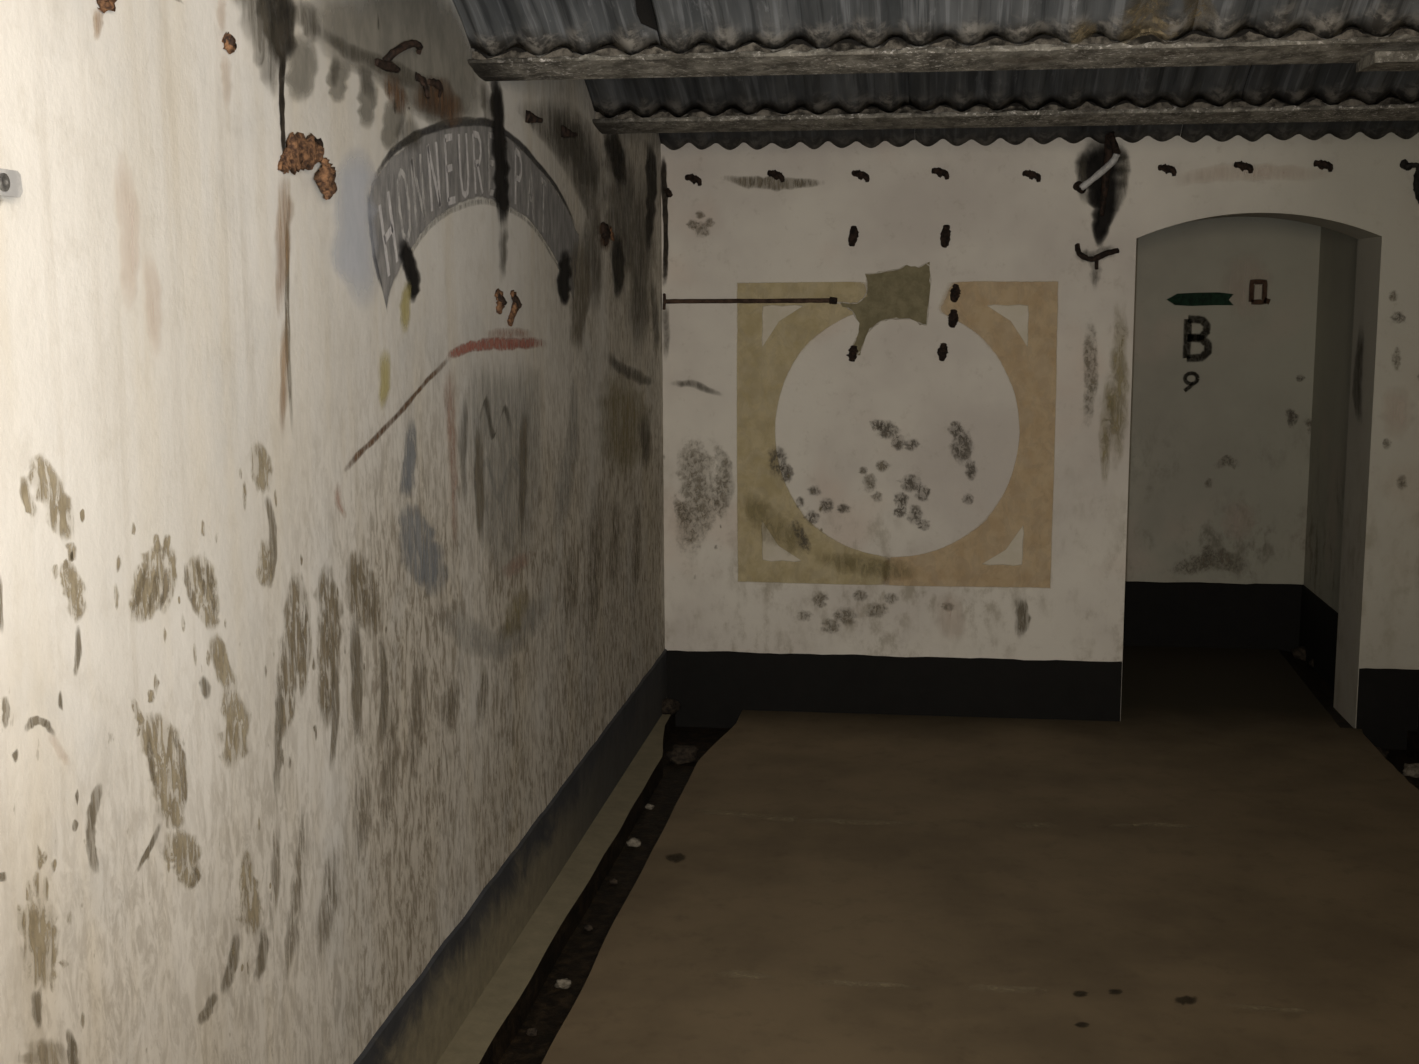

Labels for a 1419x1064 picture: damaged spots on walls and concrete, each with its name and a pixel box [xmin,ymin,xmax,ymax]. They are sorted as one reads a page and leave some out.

mould [873,421,916,450]
water stain [951,422,975,478]
water stain [676,452,729,542]
water stain [749,488,848,549]
mould [860,461,930,528]
water stain [801,591,894,631]